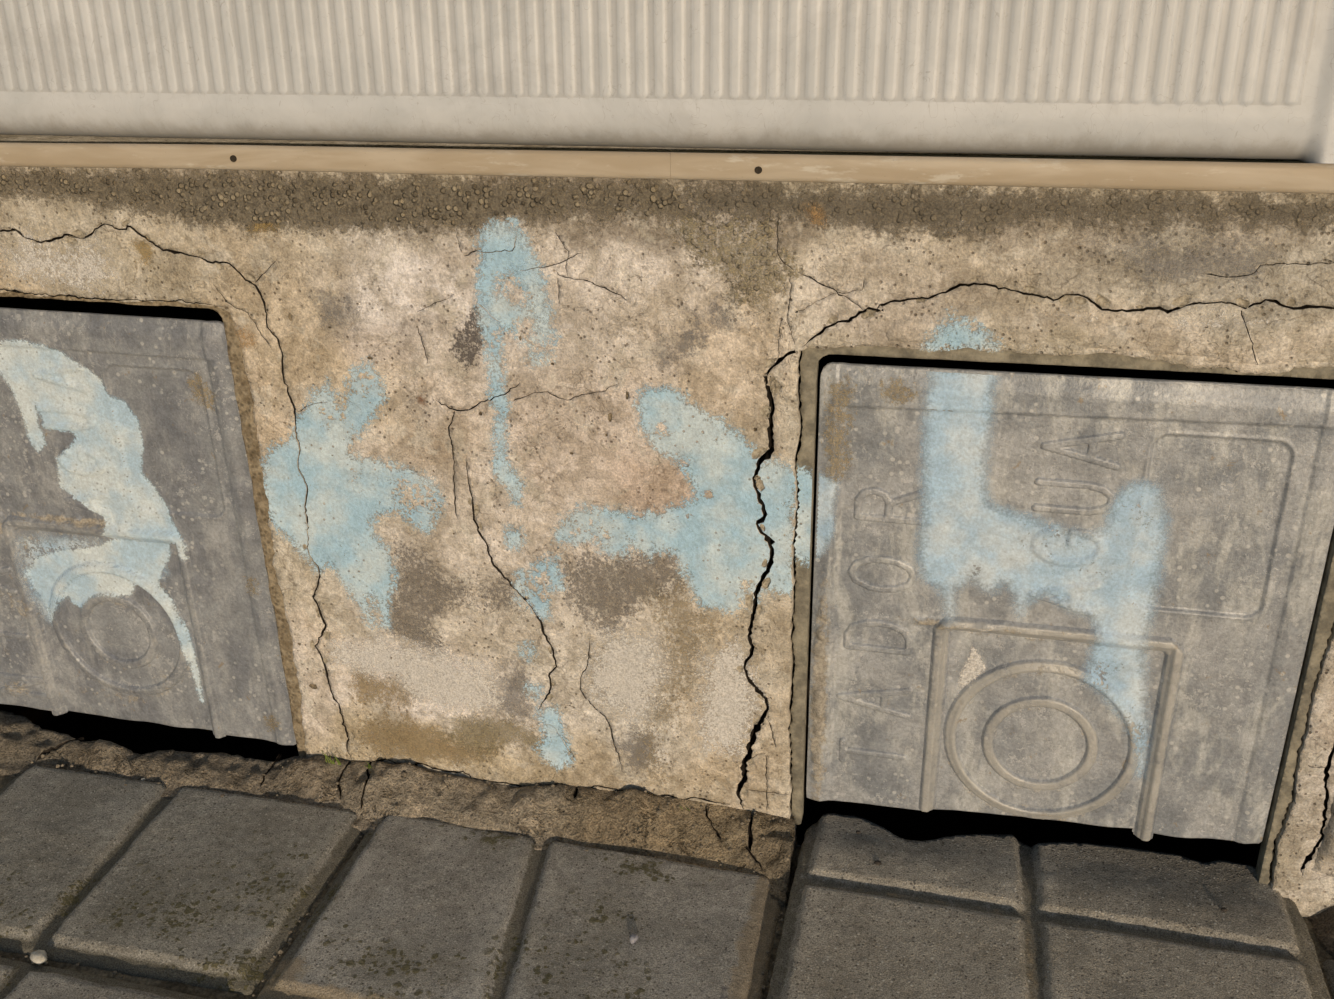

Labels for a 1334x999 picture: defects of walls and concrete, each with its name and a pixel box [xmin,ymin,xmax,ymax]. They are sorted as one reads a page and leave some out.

crack [0,220,521,809]
crack [436,383,622,799]
crack [456,229,626,300]
crack [664,218,1334,875]